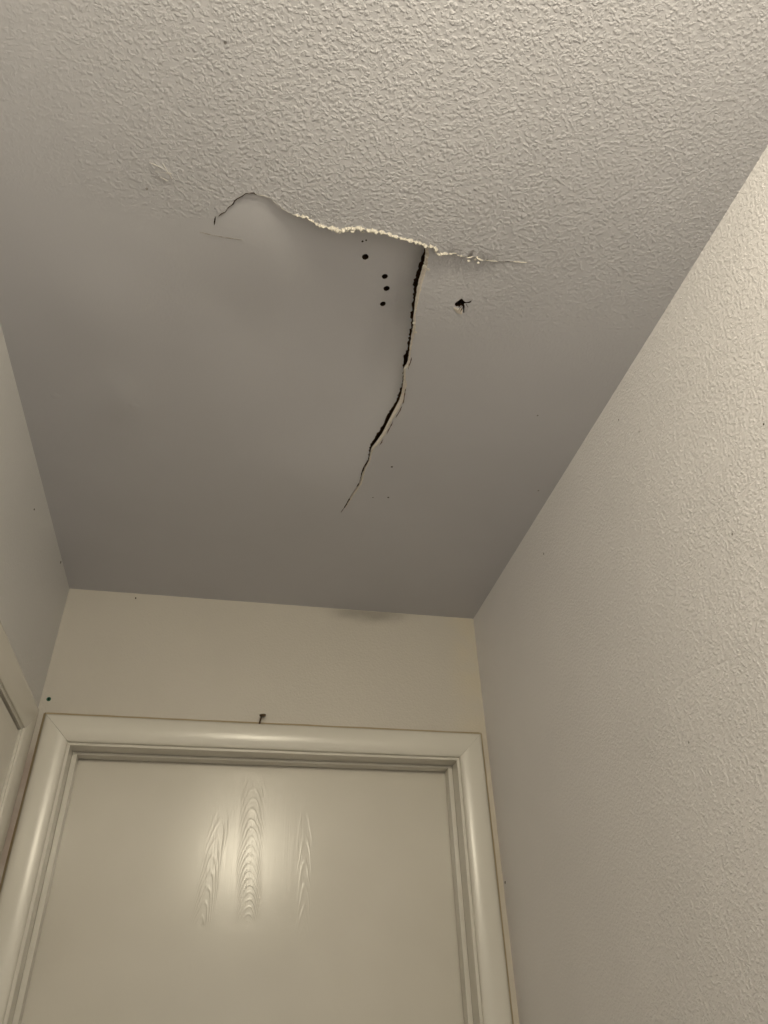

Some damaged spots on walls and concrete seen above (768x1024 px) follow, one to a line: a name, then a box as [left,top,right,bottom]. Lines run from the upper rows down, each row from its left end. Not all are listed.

crack [341,248,430,512]